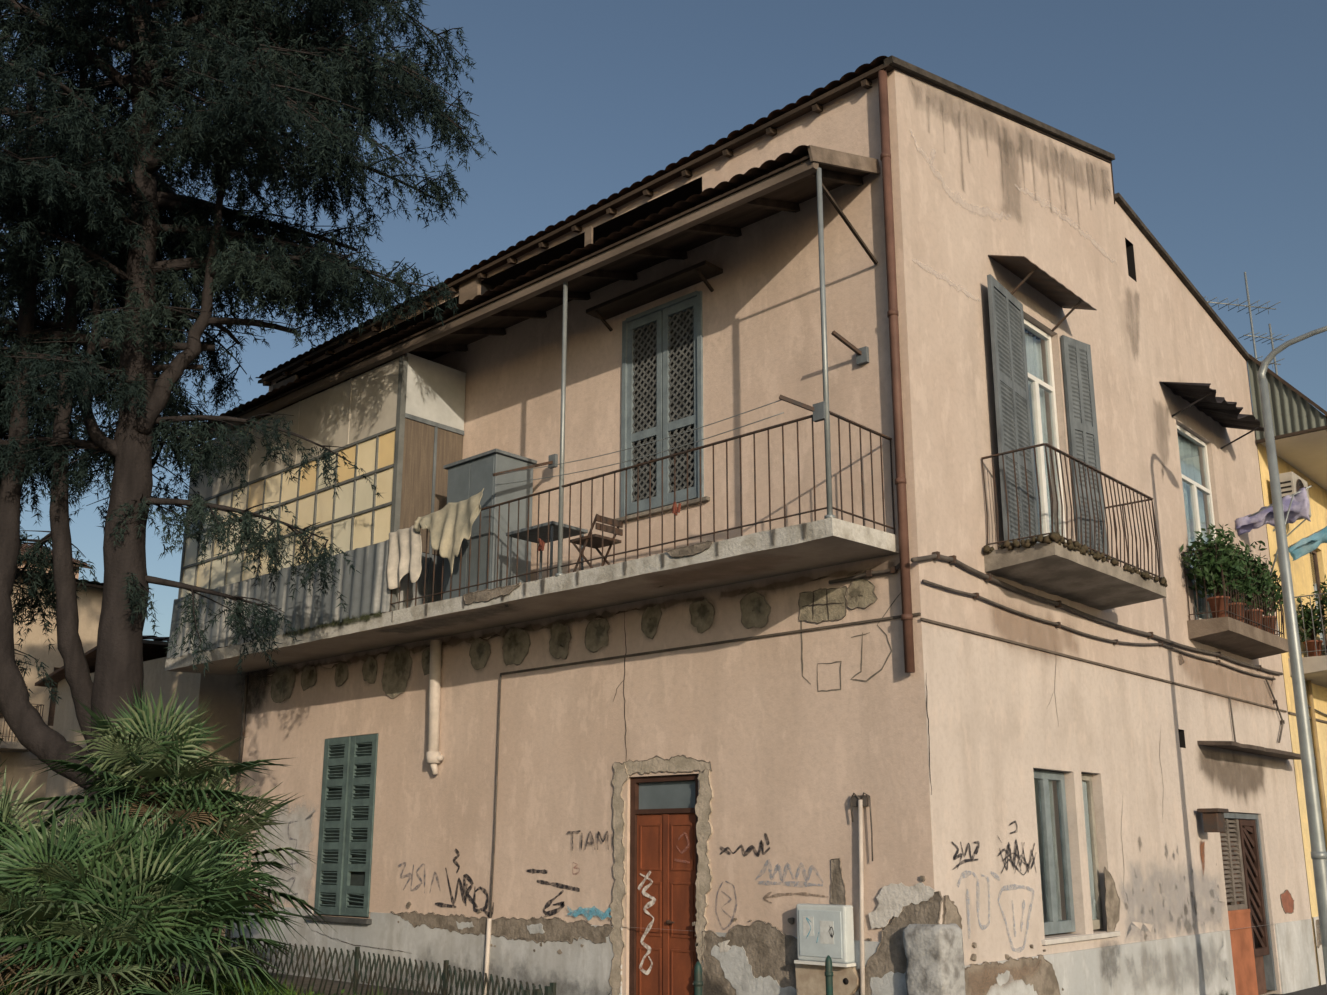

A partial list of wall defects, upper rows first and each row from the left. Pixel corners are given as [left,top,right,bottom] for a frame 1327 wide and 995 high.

spalling [463,582,521,605]
spalling [469,627,531,670]
spalling [549,618,610,660]
spalling [641,604,662,639]
spalling [689,598,715,633]
spalling [740,591,771,629]
spalling [798,577,878,624]
peeling [391,755,799,995]
flaking render [830,858,846,905]
flaking render [852,876,1064,995]